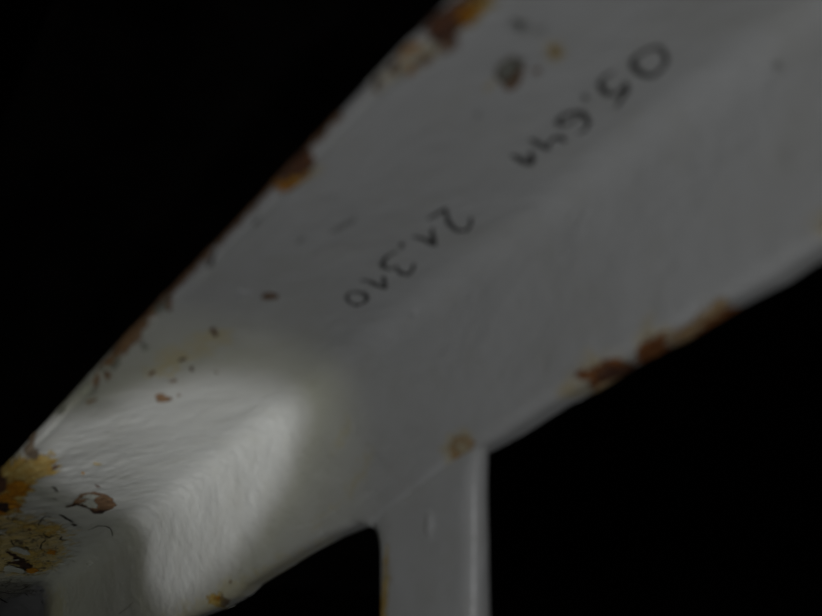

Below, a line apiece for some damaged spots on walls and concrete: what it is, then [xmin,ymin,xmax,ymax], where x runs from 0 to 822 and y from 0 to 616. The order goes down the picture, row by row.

corrosion [366,0,499,101]
corrosion [99,110,342,367]
corrosion [548,297,740,403]
peeling [64,484,117,514]
peeling [0,547,43,604]